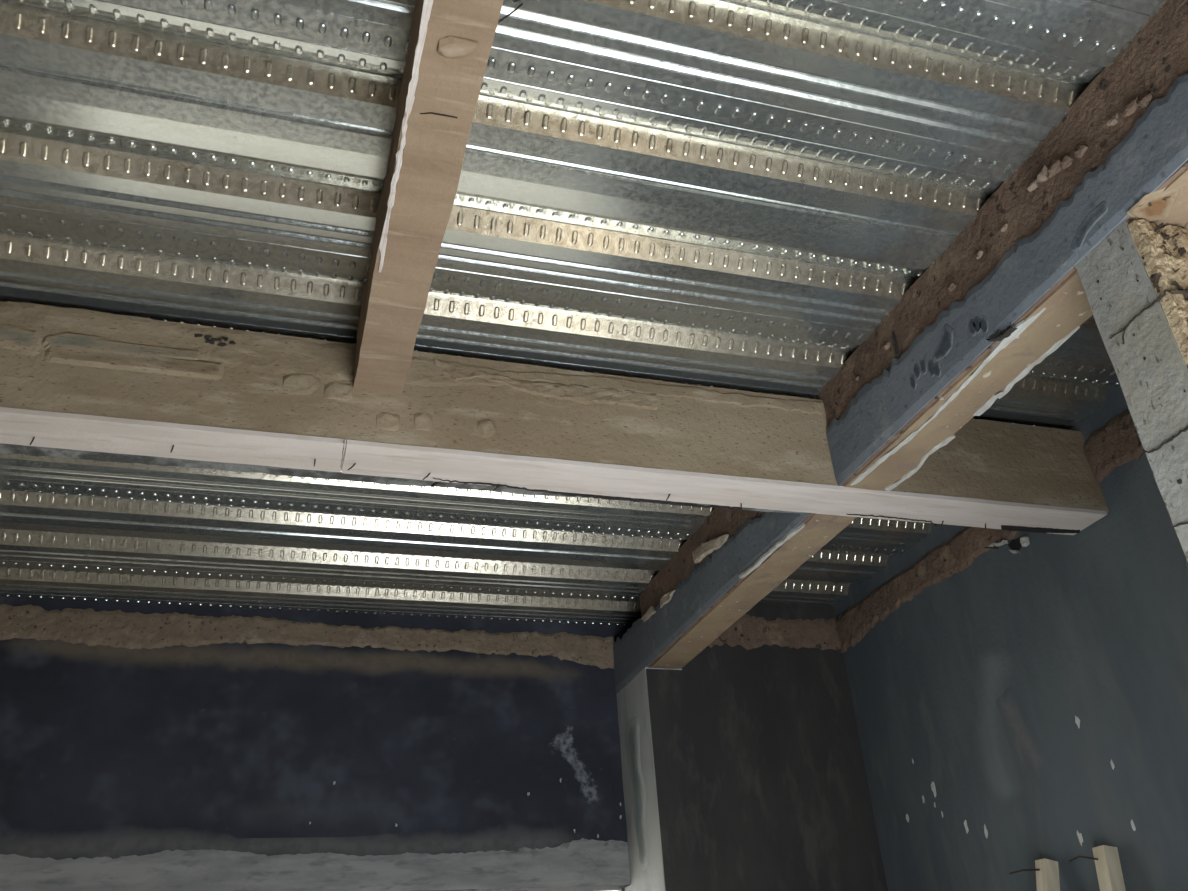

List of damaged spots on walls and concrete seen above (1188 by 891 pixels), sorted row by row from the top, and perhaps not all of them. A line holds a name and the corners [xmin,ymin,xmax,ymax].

spalling [1106,91,1154,126]
spalling [1027,144,1088,192]
crack [1110,281,1188,343]
flaking render [973,326,1080,416]
flaking render [850,308,1046,491]
crack [1142,427,1188,453]
flaking render [739,523,805,579]